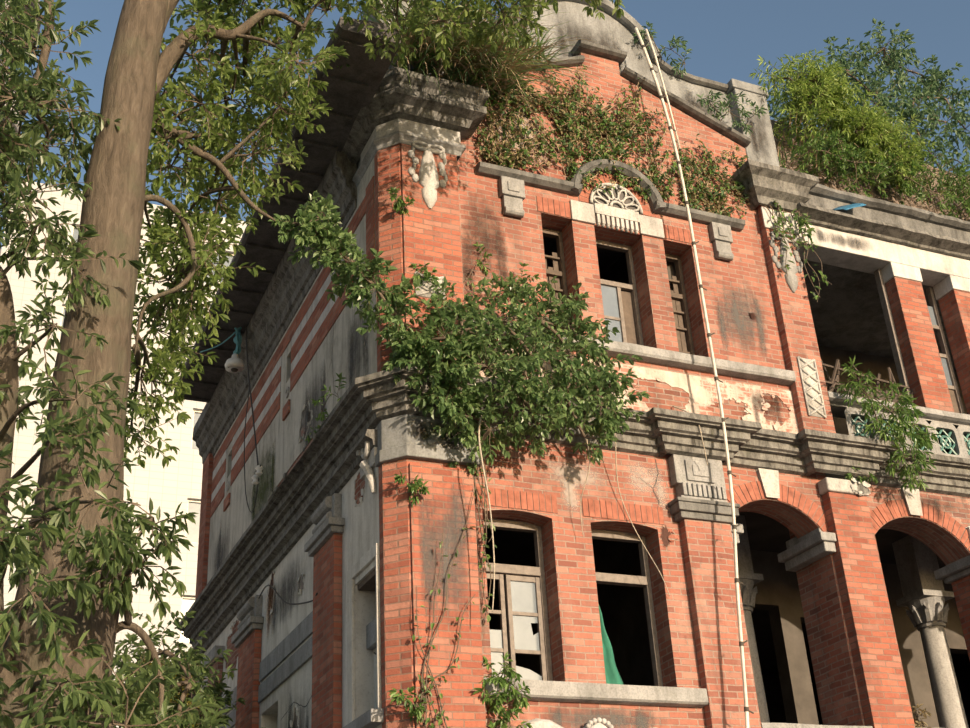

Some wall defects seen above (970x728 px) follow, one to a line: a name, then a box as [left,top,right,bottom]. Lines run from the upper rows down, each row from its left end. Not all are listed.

damp [719,293,764,343]
peeling [601,376,792,431]
damp [421,499,479,599]